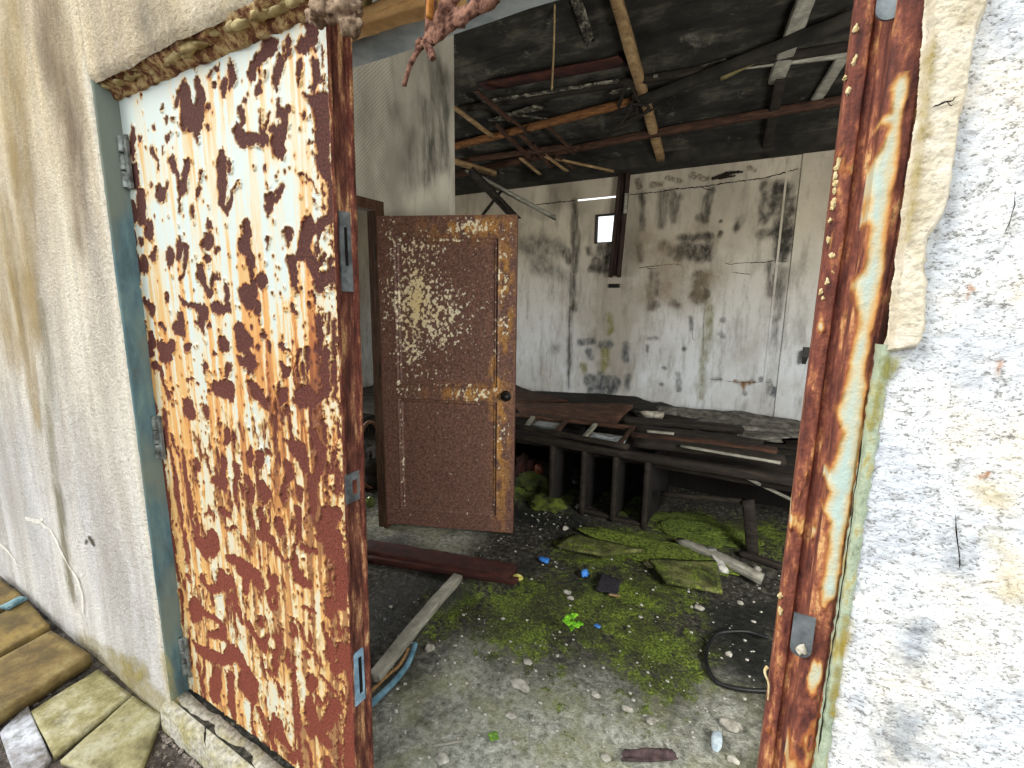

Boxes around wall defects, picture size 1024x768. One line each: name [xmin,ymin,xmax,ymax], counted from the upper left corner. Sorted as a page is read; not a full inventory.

damp [562,204,611,272]
damp [659,188,739,303]
damp [760,182,795,297]